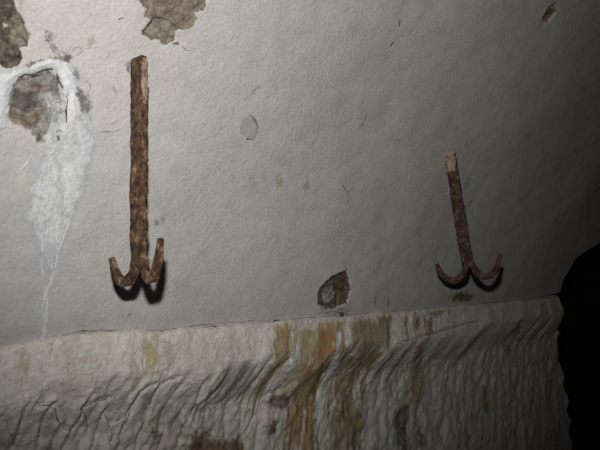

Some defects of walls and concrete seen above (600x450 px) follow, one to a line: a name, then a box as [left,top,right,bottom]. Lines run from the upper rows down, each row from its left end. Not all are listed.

flaking render [0,0,31,68]
flaking render [139,0,206,51]
flaking render [9,72,62,142]
leakage [0,55,95,340]
flaking render [318,271,350,317]
crack [37,377,179,446]
rust [252,313,391,450]
rust [400,312,433,404]